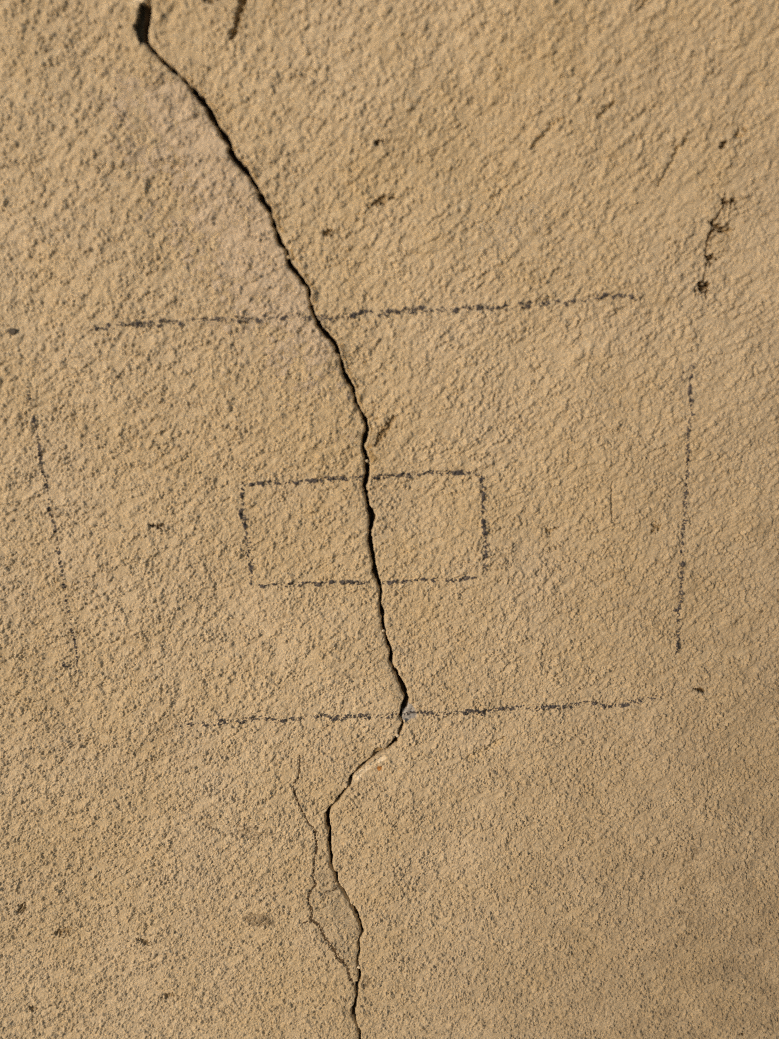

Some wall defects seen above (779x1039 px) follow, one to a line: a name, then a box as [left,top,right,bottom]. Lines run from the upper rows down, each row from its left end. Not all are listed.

crack [129,0,409,1039]